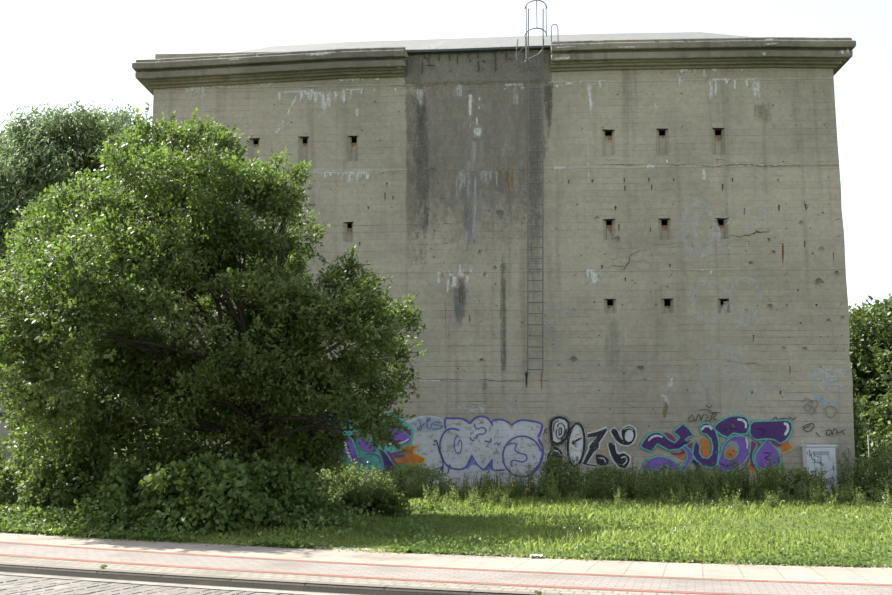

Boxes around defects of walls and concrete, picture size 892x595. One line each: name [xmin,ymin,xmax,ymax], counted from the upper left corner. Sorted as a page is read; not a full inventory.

leakage [251,78,363,133]
leakage [678,68,760,99]
leakage [417,80,606,244]
leakage [437,265,472,317]